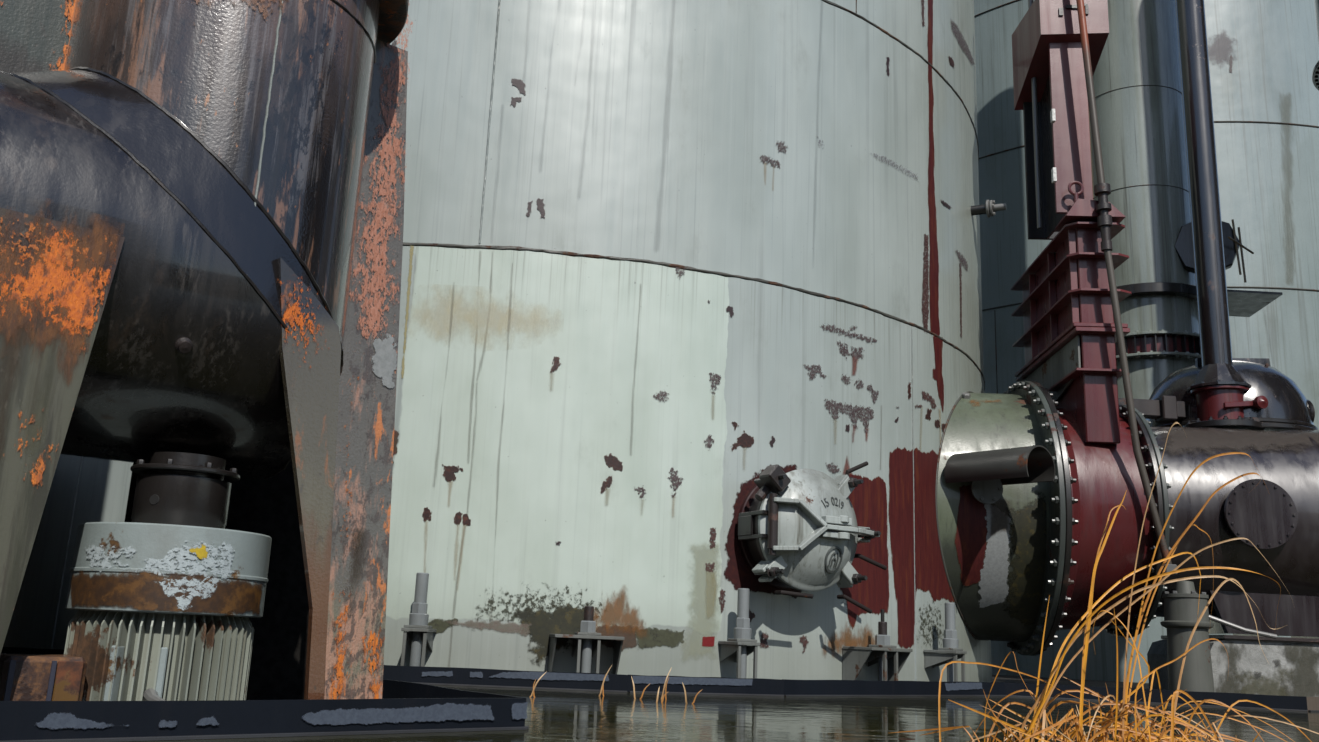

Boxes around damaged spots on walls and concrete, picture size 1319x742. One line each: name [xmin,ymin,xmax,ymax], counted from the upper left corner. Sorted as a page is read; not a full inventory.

corrosion [50,0,76,71]
corrosion [349,3,413,353]
corrosion [0,211,118,381]
corrosion [280,276,325,368]
peeling [86,540,237,581]
water stain [428,587,685,666]